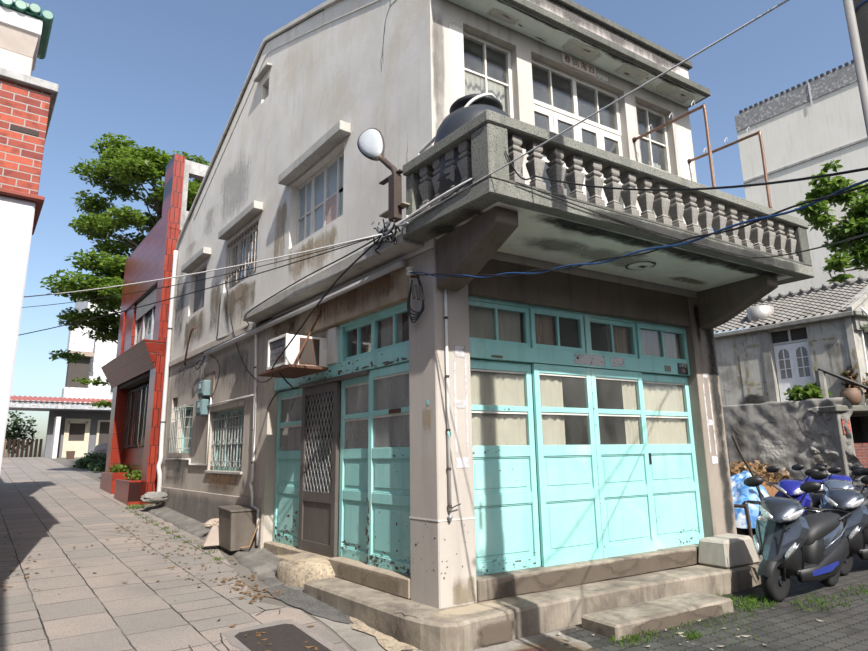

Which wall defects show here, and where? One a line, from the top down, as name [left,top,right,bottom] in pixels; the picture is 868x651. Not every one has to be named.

leakage [274,204,286,255]
leakage [289,228,335,274]
leakage [175,272,255,343]
crack [749,411,812,463]
peeling [342,498,422,575]